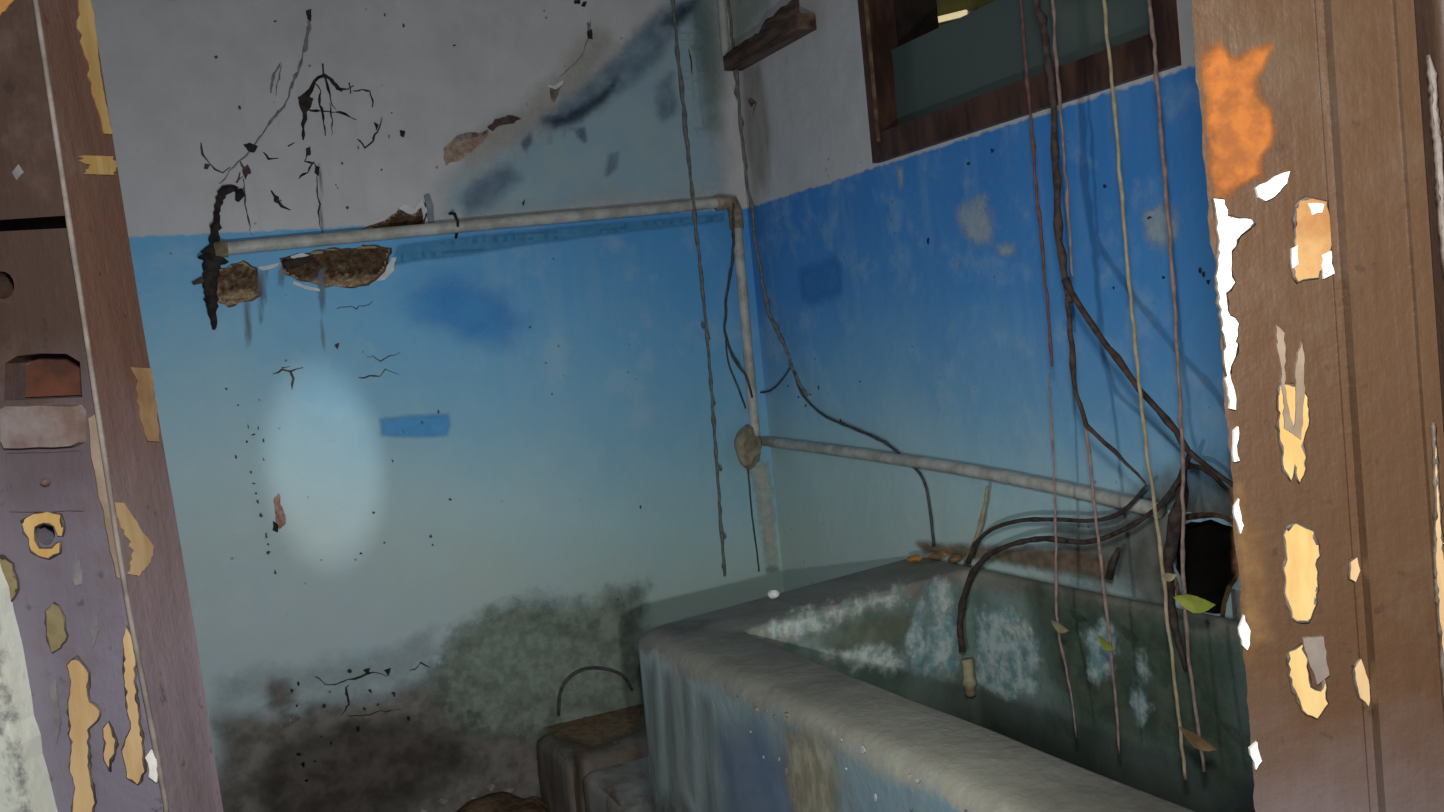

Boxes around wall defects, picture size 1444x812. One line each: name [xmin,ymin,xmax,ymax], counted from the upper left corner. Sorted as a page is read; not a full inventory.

crack [200,9,405,235]
water stain [453,0,720,210]
rust [1202,45,1273,197]
peeling [1198,197,1256,462]
peeling [1275,325,1310,484]
peeling [1289,196,1335,284]
peeling [44,602,159,812]
water stain [219,587,796,812]
water stain [762,579,1040,702]
water stain [1086,618,1119,682]
water stain [1131,663,1148,728]
peeling [1282,522,1329,719]